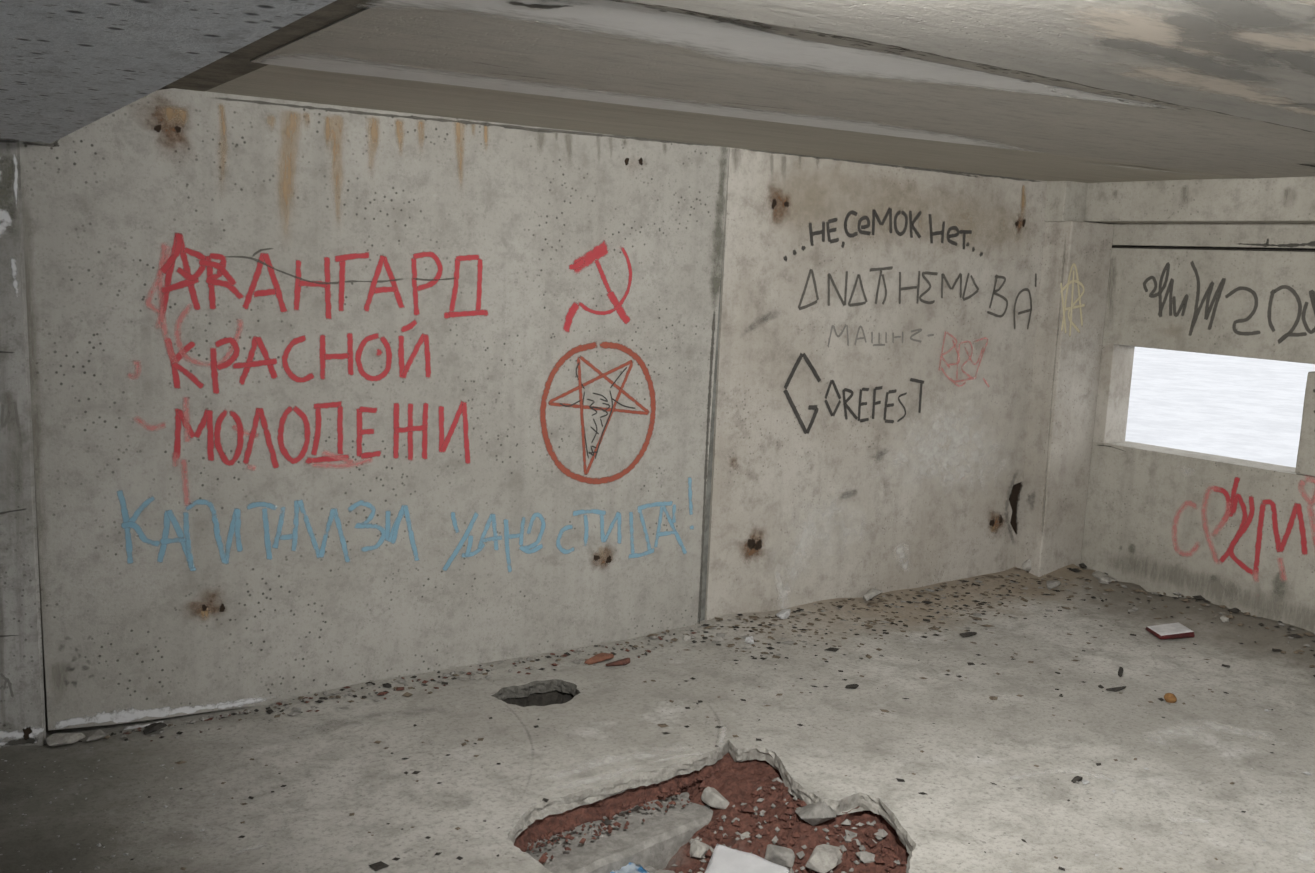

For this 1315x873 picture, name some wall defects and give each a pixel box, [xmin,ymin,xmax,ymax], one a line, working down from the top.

spalling [509,1,568,9]
peeling [616,0,1315,132]
corrosion [148,106,186,147]
spalling [1009,482,1034,536]
damp [0,698,266,745]
spalling [514,753,910,873]